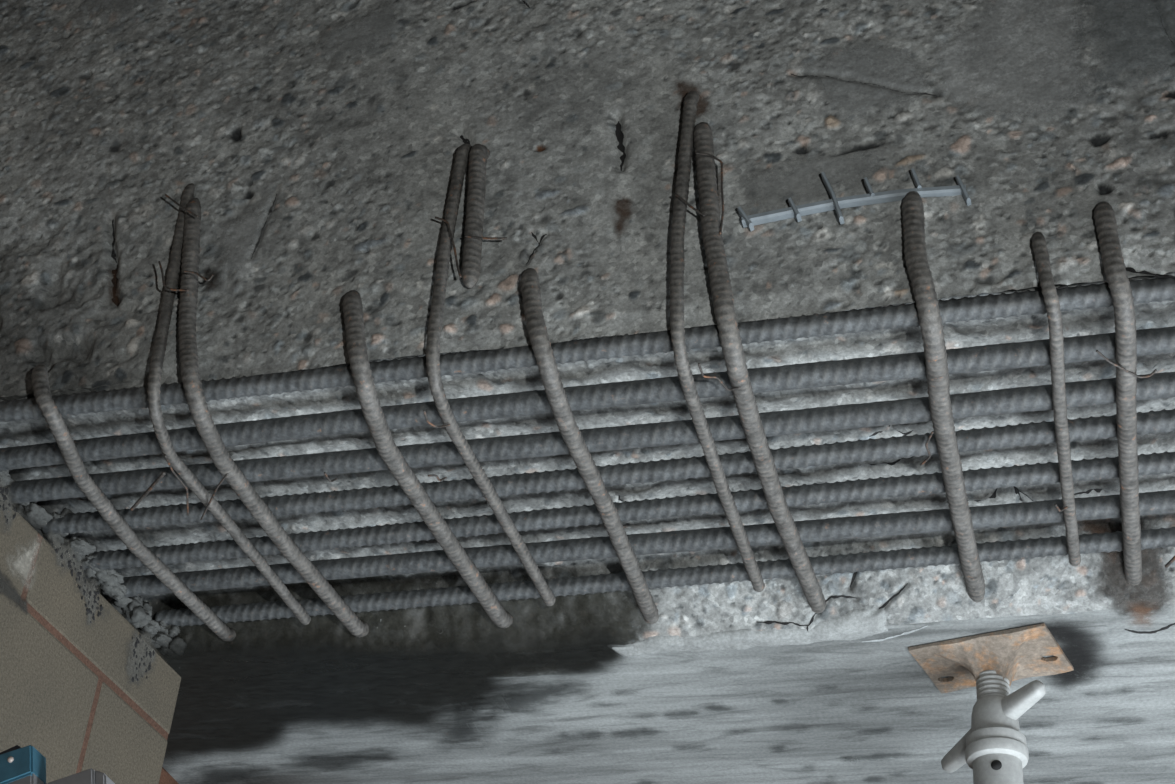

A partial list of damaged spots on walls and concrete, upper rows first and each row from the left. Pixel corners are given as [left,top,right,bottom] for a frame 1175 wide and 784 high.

corrosion [678,84,708,116]
spalling [0,0,1175,406]
corrosion [616,199,631,232]
spalling [206,386,361,424]
spalling [390,413,559,446]
spalling [572,395,739,430]
spalling [754,377,928,413]
spalling [777,454,942,487]
spalling [959,437,1118,471]
spalling [275,504,423,534]
spalling [621,552,1122,642]
corrosion [1100,548,1166,615]